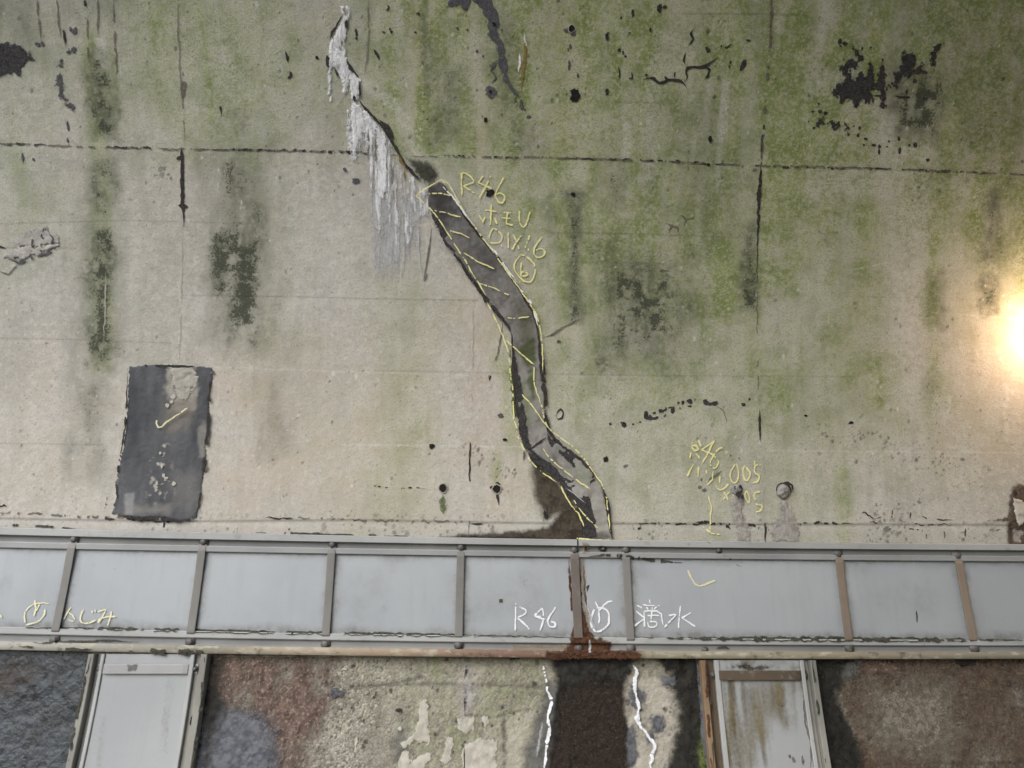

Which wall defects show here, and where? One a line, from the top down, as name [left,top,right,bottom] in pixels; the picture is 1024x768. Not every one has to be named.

spalling [832,39,942,109]
water stain [328,5,438,282]
crack [0,0,1024,542]
rust [514,543,641,660]
water stain [525,658,664,768]
water stain [661,659,708,768]